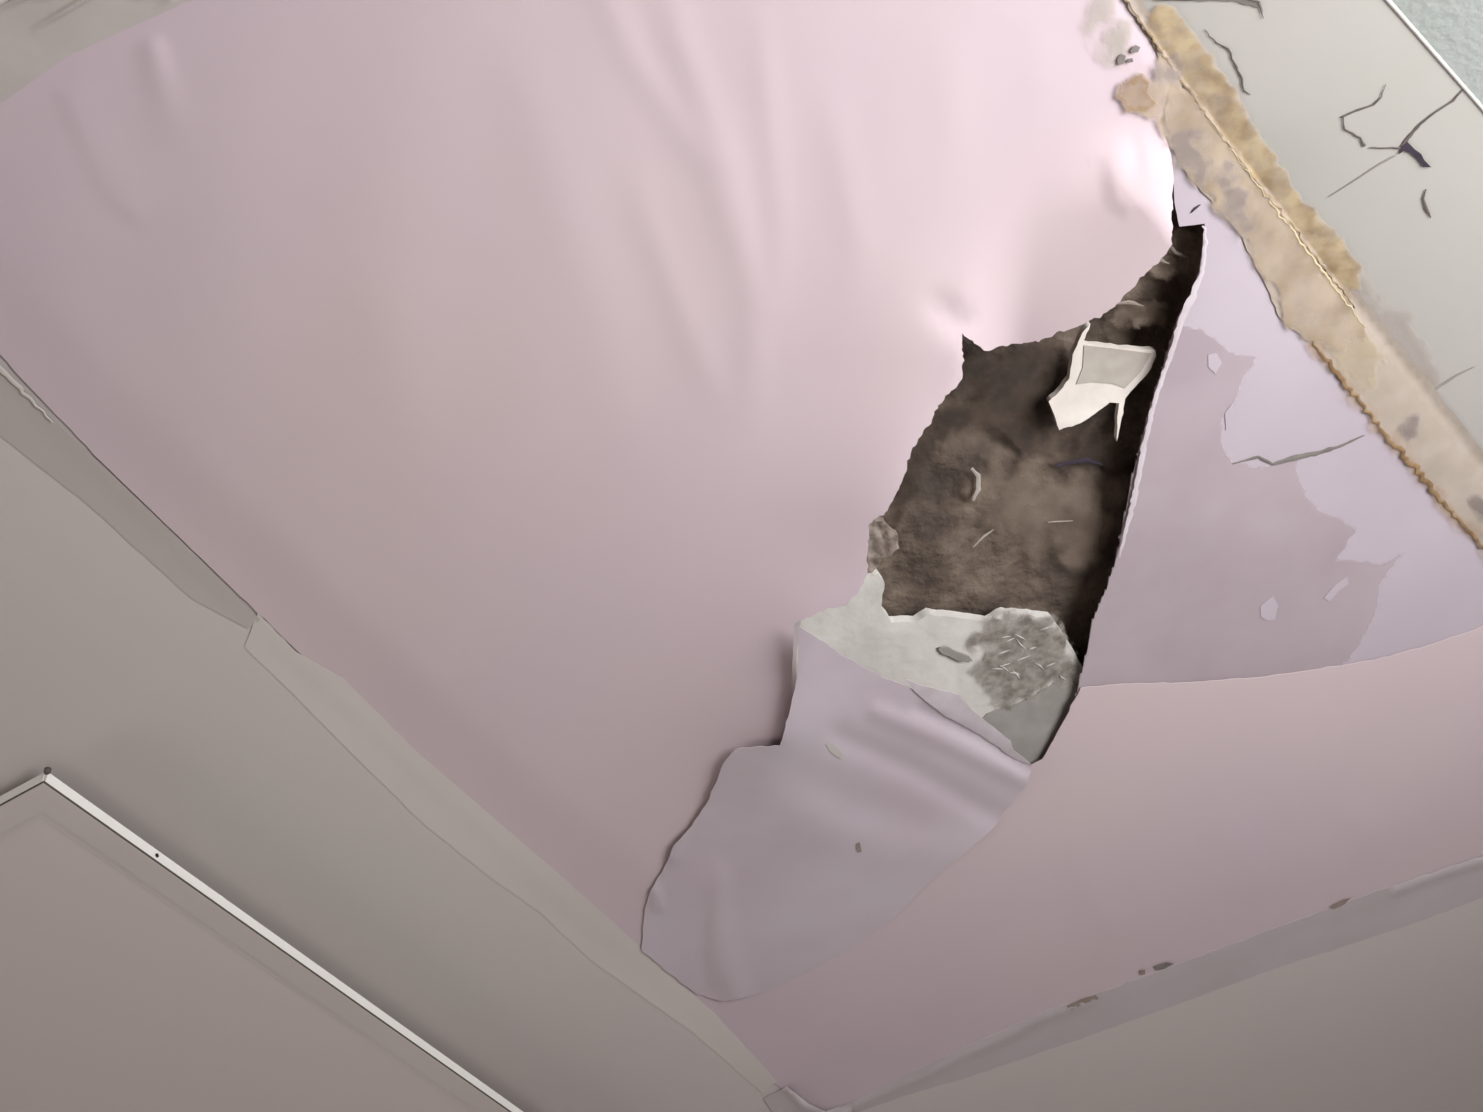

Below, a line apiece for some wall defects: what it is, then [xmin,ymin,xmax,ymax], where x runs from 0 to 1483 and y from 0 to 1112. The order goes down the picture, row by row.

damp [1089,0,1439,388]
crack [1329,84,1464,218]
peeling [800,144,1483,765]
damp [1400,415,1420,439]
damp [1470,496,1483,516]